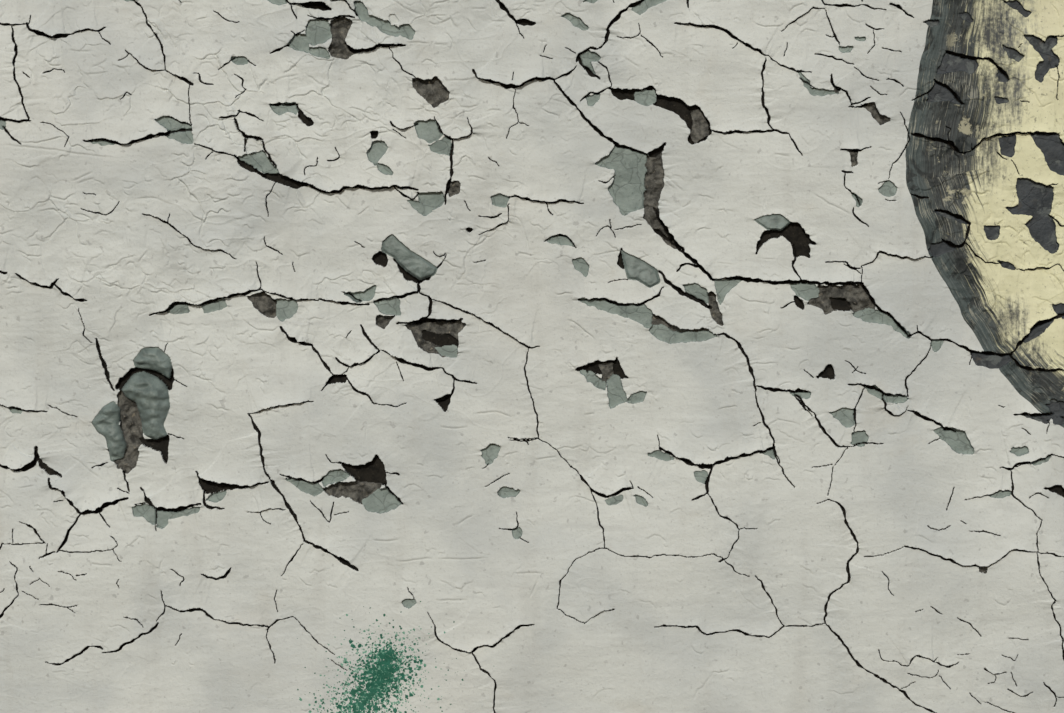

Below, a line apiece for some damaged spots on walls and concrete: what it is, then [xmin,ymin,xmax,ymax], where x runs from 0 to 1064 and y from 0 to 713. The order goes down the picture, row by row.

crack [0,0,194,125]
peeling [149,234,466,358]
peeling [269,0,584,235]
crack [472,45,647,166]
spalling [555,47,712,145]
spalling [578,142,911,344]
crack [599,0,914,155]
peeling [997,132,1064,254]
crack [0,446,129,618]
crack [45,324,477,671]
spalling [280,454,403,523]
crack [427,299,1064,713]